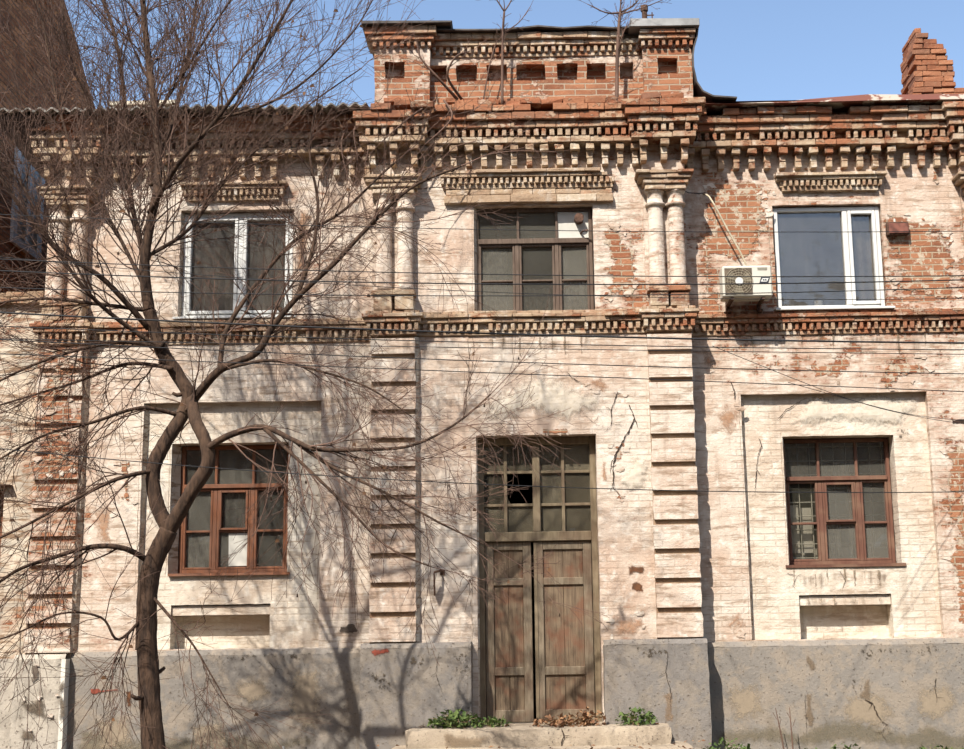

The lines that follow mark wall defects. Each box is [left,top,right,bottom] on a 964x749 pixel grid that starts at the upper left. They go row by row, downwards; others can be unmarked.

peeling [602,224,639,302]
peeling [696,178,776,293]
peeling [884,212,962,298]
peeling [44,360,75,415]
peeling [32,437,76,477]
crack [585,392,638,493]
peeling [940,446,964,623]